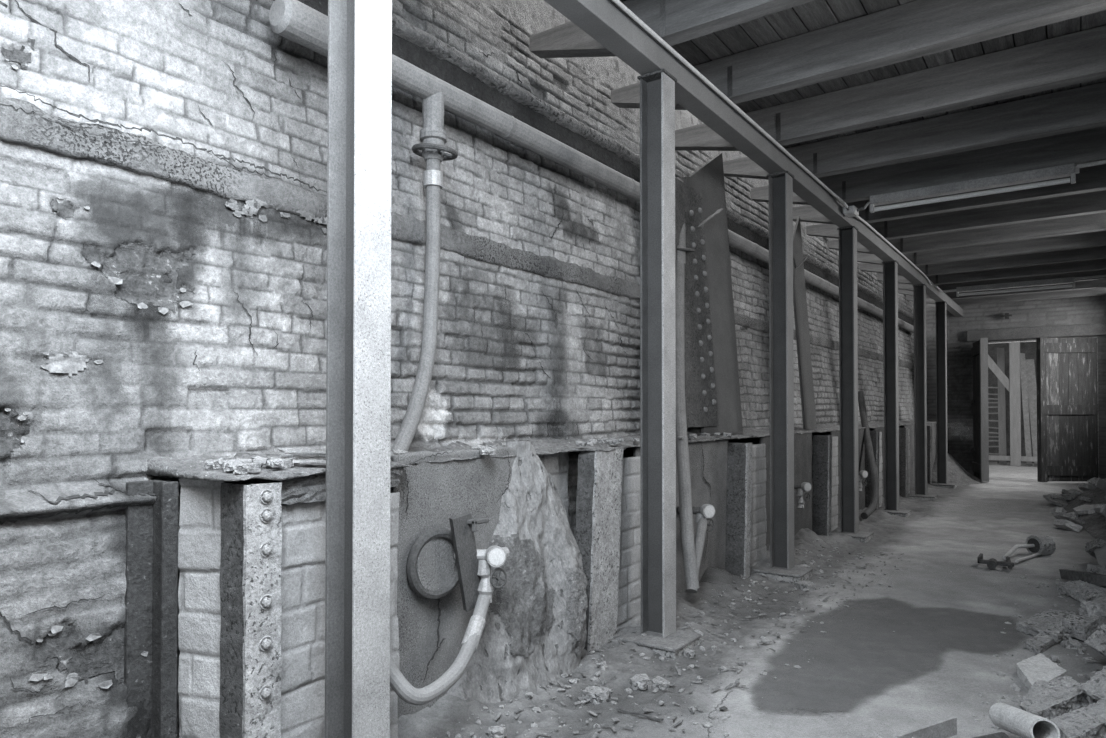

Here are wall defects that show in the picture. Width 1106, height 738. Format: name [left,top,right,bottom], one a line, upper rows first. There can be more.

crack [223,61,255,120]
crack [0,85,326,192]
spalling [51,196,90,219]
flaking render [225,198,327,234]
damp [80,184,327,308]
spalling [82,241,196,315]
damp [130,302,167,365]
peeling [40,351,103,376]
spalling [0,408,30,465]
crack [0,594,106,646]
spalling [29,622,124,689]
crack [10,678,90,725]